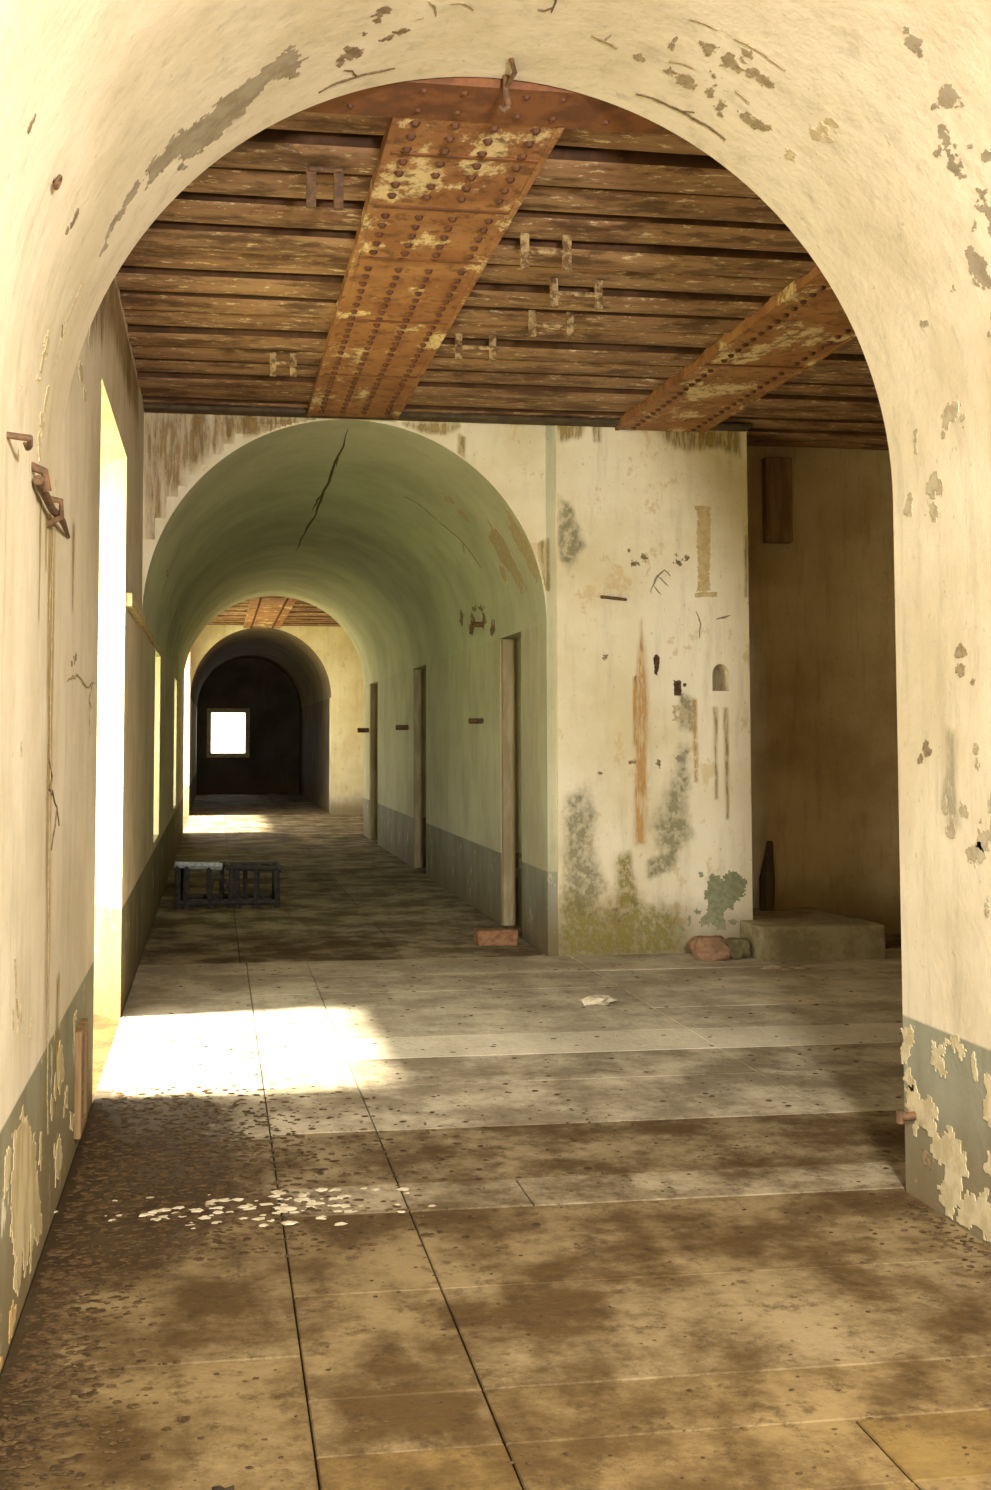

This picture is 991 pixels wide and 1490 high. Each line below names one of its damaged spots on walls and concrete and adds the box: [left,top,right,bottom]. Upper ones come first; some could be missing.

crack [538,0,557,13]
flaking render [99,43,309,257]
flaking render [931,83,991,290]
leakage [91,283,138,414]
crack [296,429,348,550]
leakage [540,504,582,590]
leakage [39,502,60,1109]
crack [12,480,95,1135]
leakage [568,795,598,911]
rust [634,645,646,843]
peeling [0,1010,77,1369]
peeling [900,1025,991,1243]